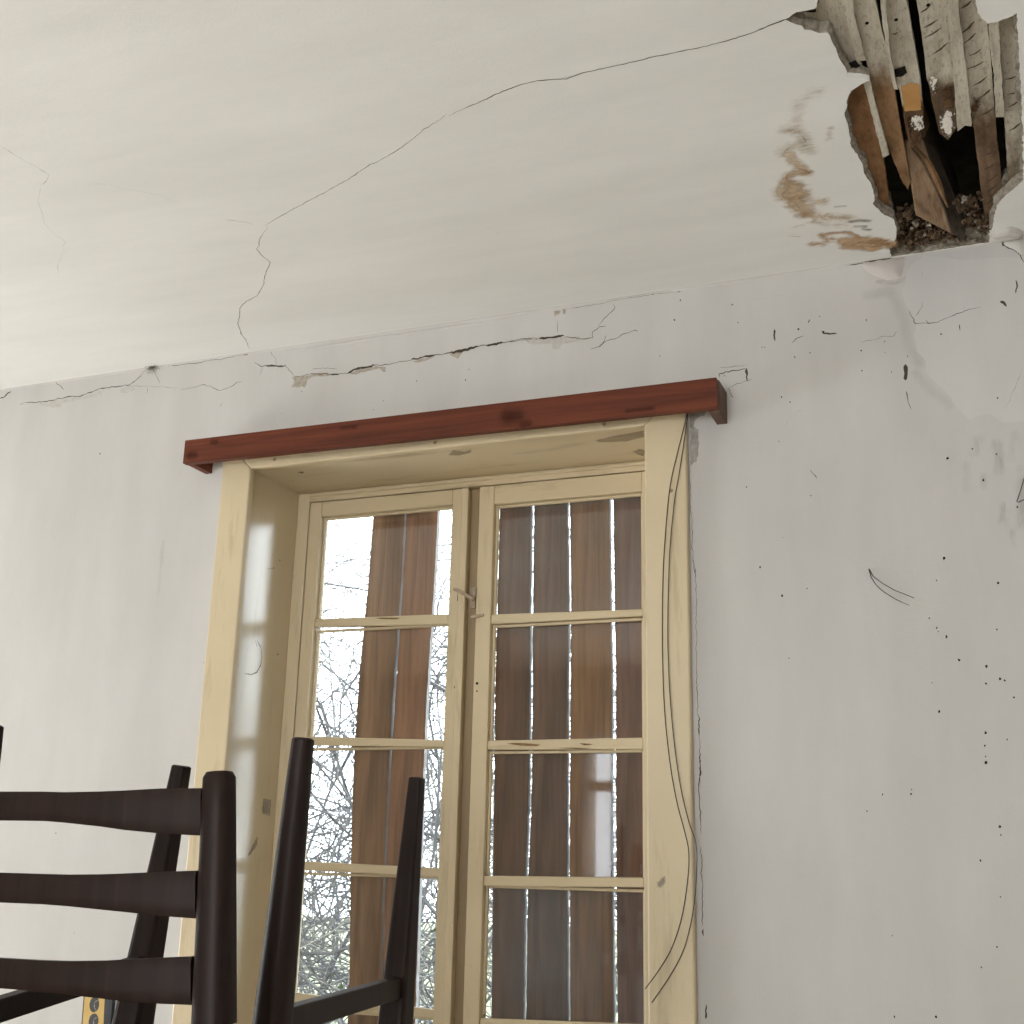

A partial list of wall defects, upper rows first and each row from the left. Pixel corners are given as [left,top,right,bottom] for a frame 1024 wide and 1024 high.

crack [1,19,786,406]
water stain [776,130,897,251]
spalling [789,0,1023,256]
spalling [292,372,331,392]